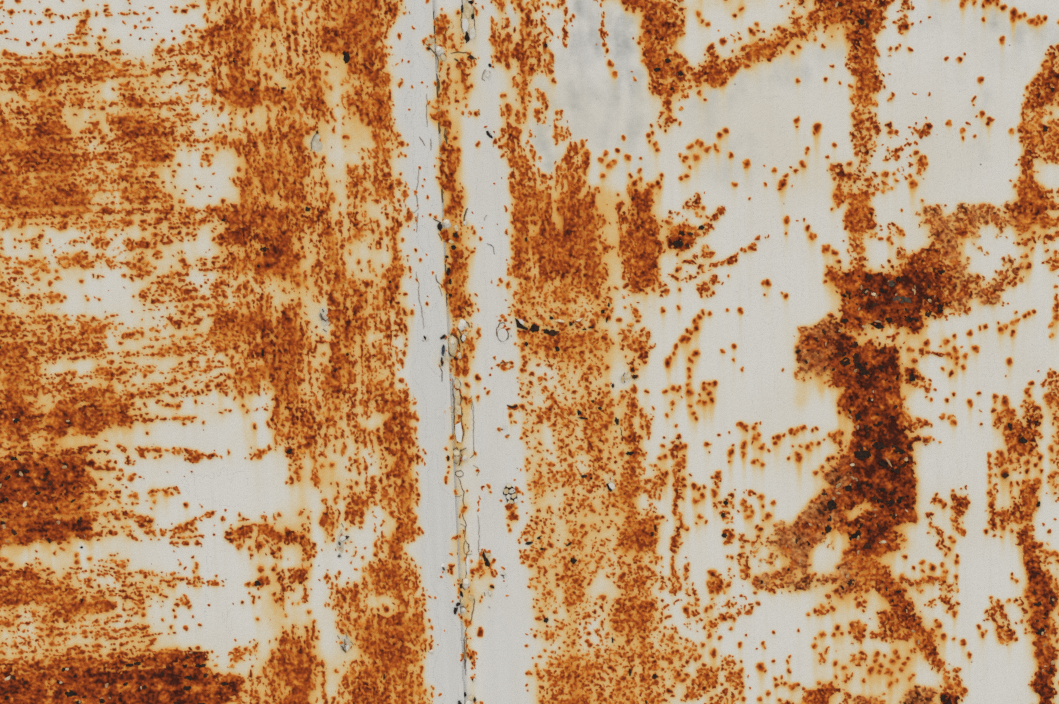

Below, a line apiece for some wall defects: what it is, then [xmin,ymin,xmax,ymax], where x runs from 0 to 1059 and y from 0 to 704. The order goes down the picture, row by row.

peeling [460,0,475,43]
corrosion [0,0,792,704]
corrosion [588,0,1059,704]
peeling [452,378,474,446]
peeling [503,484,518,504]